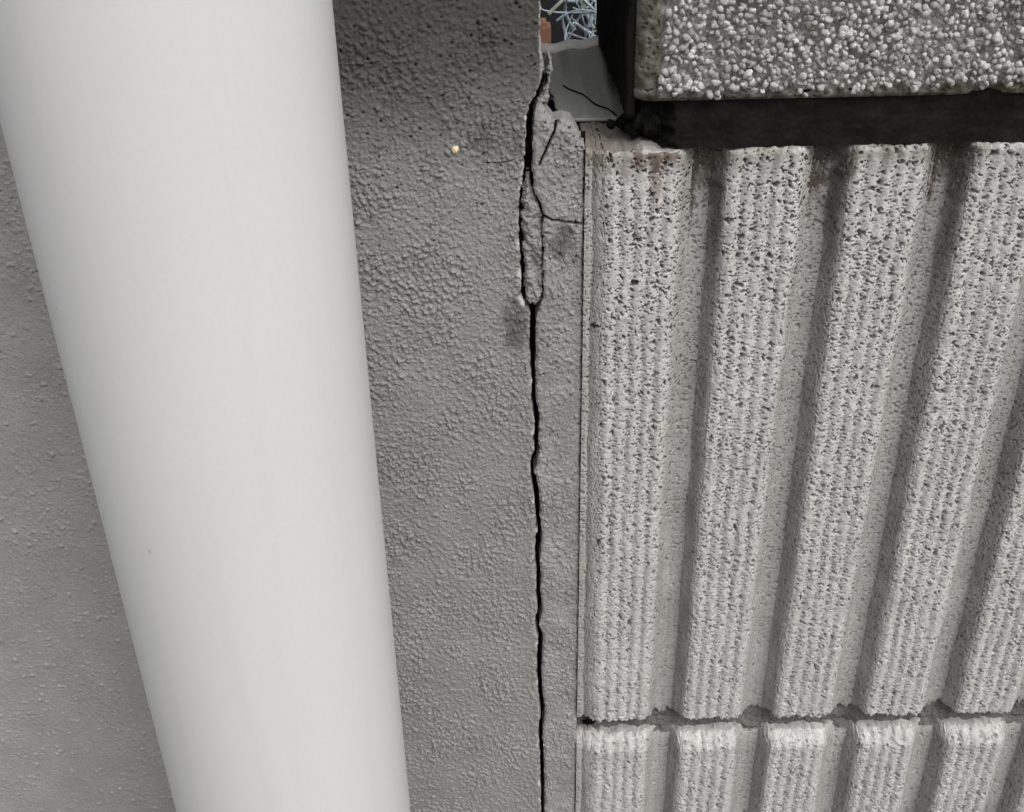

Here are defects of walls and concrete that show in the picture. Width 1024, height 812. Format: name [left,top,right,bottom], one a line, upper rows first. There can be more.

crack [483,53,584,812]